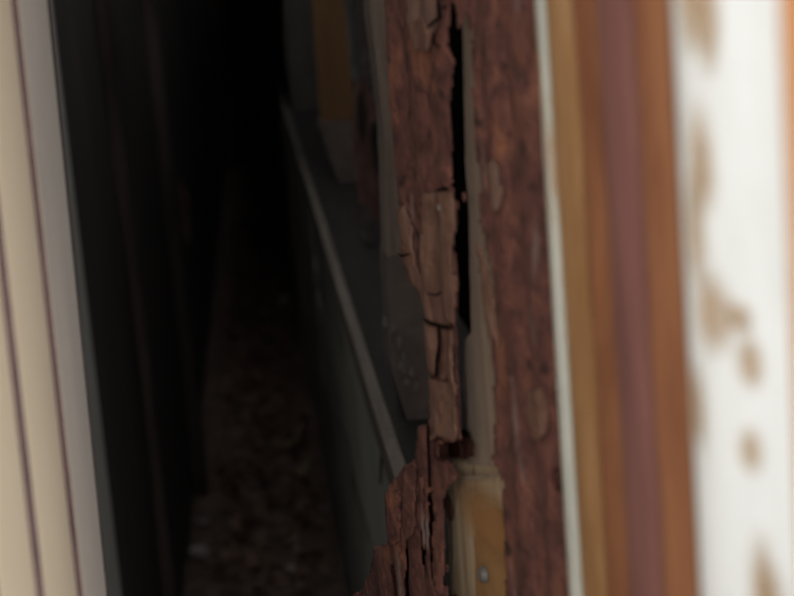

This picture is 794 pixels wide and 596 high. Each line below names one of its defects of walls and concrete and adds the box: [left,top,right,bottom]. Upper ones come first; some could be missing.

crack [425,0,446,48]
spalling [447,2,471,333]
crack [422,318,449,377]